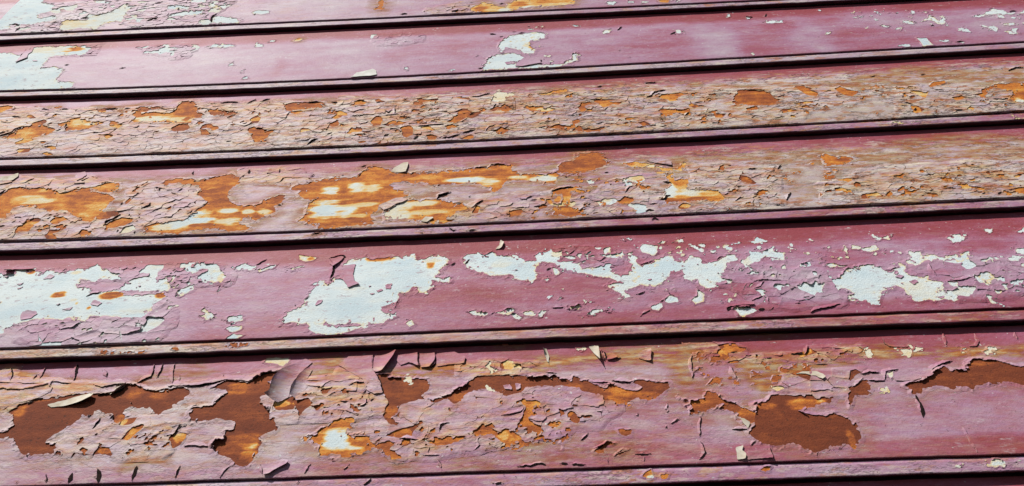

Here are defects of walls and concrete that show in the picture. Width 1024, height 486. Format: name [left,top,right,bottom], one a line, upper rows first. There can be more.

peeling [0,0,270,34]
peeling [0,42,106,90]
rust [0,100,339,145]
rust [351,88,604,140]
rust [660,68,1024,124]
rust [0,149,737,236]
peeling [421,157,789,224]
peeling [0,226,1024,346]
peeling [54,413,192,463]
rust [0,368,282,474]
peeling [261,348,626,464]
rust [294,345,1024,466]